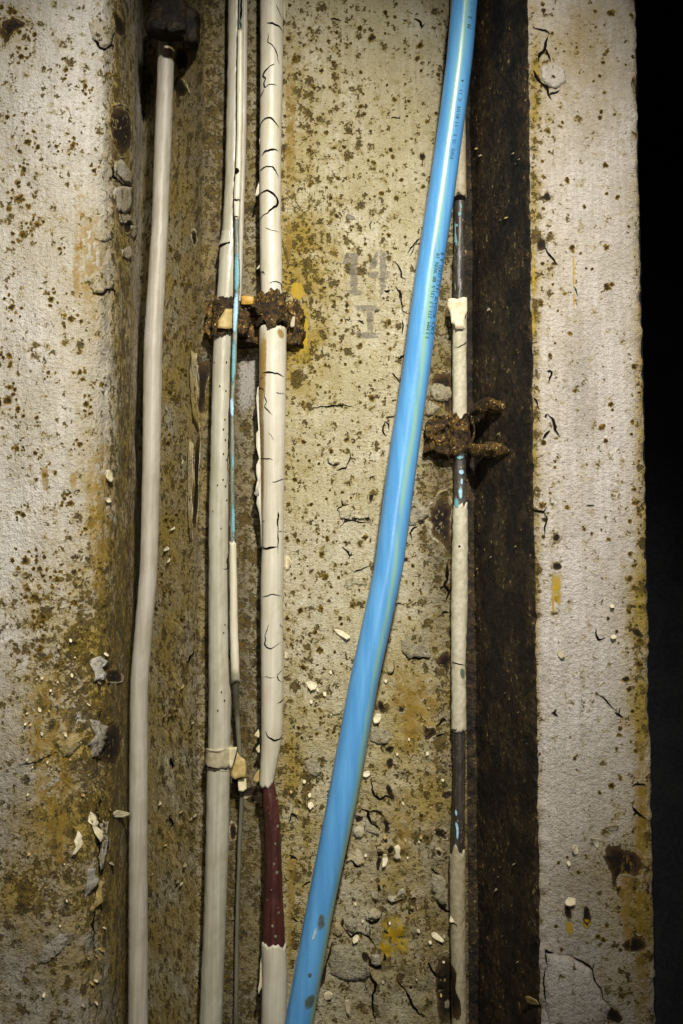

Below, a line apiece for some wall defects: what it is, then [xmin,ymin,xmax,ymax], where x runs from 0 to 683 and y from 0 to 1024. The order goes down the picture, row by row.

crack [533,28,559,100]
crack [337,499,374,572]
peeling [90,652,124,685]
spalling [80,718,125,769]
peeling [64,809,132,918]
peeling [346,813,449,916]
peeling [432,874,455,923]
peeling [321,917,371,1001]
water stain [380,918,409,957]
spalling [417,929,452,1024]
crack [543,949,612,1006]